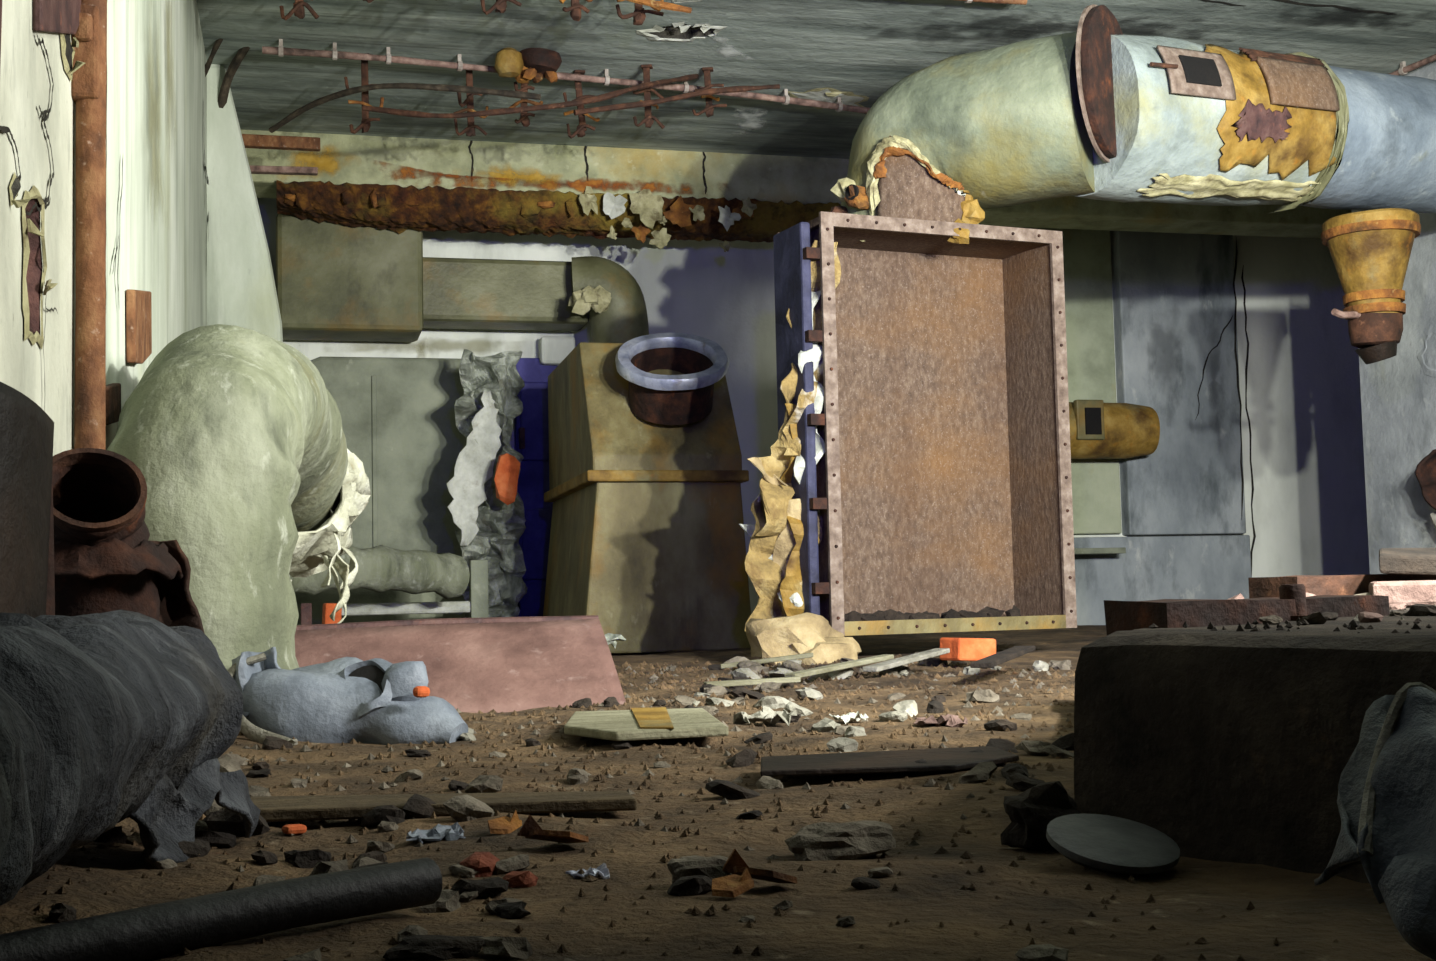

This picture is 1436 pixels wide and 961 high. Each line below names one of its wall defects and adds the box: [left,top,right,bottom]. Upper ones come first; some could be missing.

spalling [636,22,728,42]
crack [0,35,58,411]
spalling [9,172,58,349]
corrosion [276,147,841,243]
flaking render [579,186,757,252]